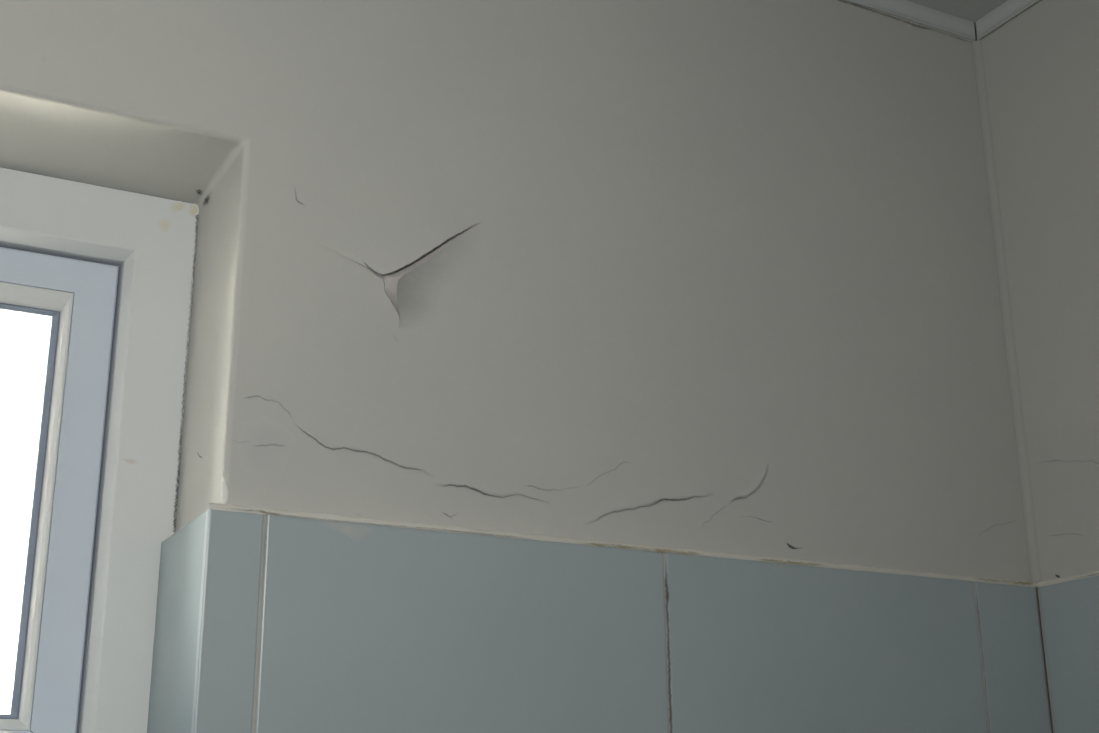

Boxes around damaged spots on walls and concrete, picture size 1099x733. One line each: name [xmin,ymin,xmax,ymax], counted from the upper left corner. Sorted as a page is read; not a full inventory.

flaking render [313,205,486,328]